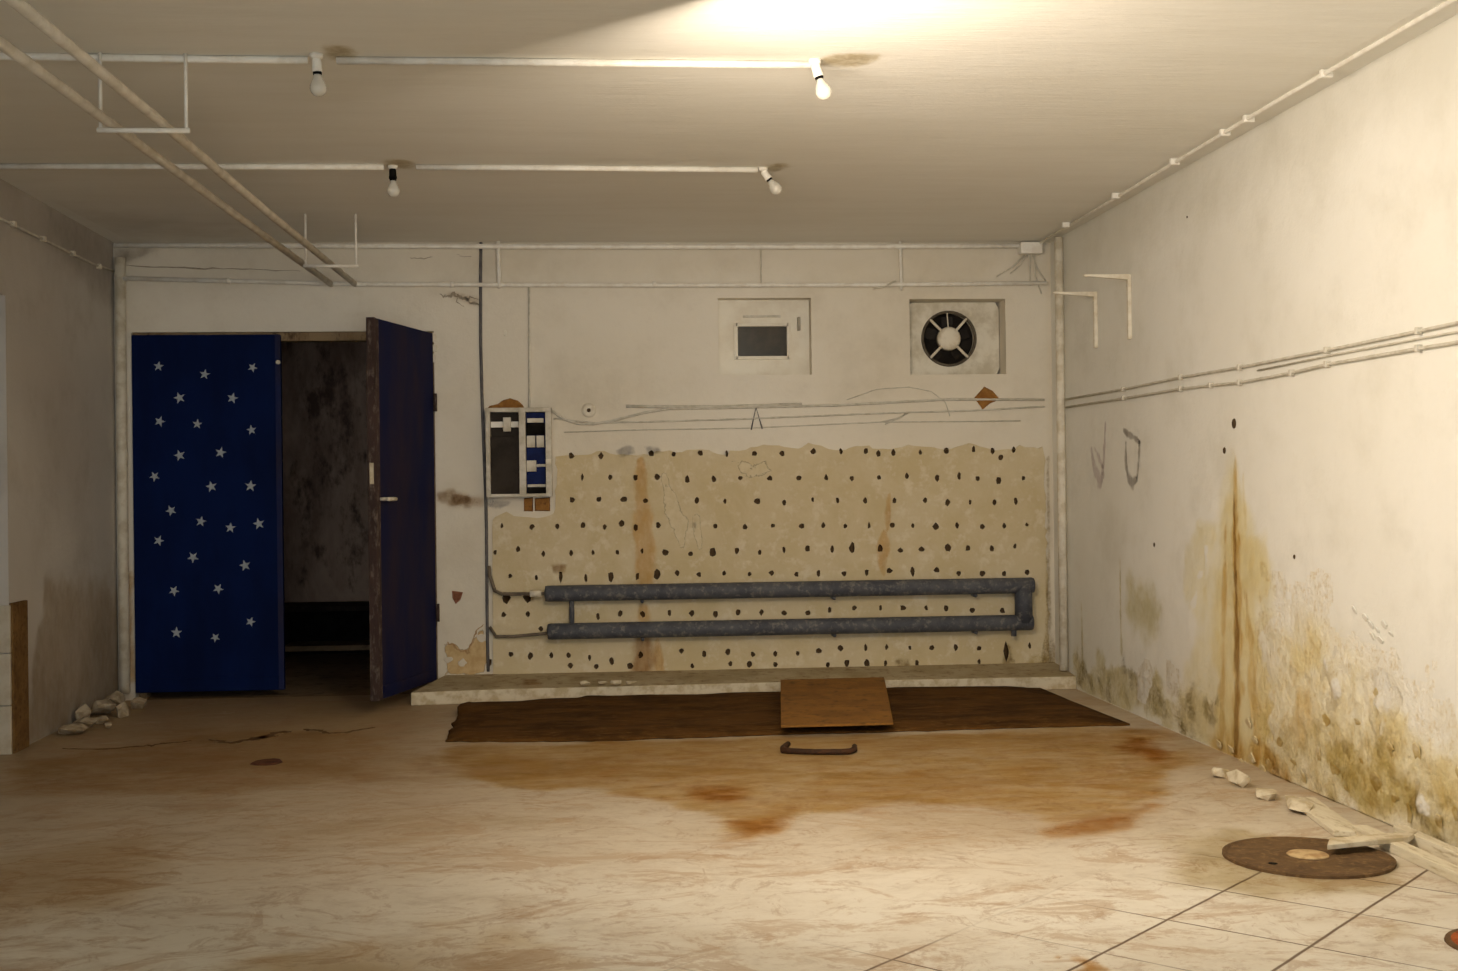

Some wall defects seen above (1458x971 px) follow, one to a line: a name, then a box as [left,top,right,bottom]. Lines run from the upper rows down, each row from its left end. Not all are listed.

spalling [957,446,1016,505]
spalling [878,544,925,576]
spalling [502,575,543,632]
water stain [1135,478,1226,711]
peeling [443,624,643,675]
spalling [796,644,888,667]
peeling [1249,562,1458,848]